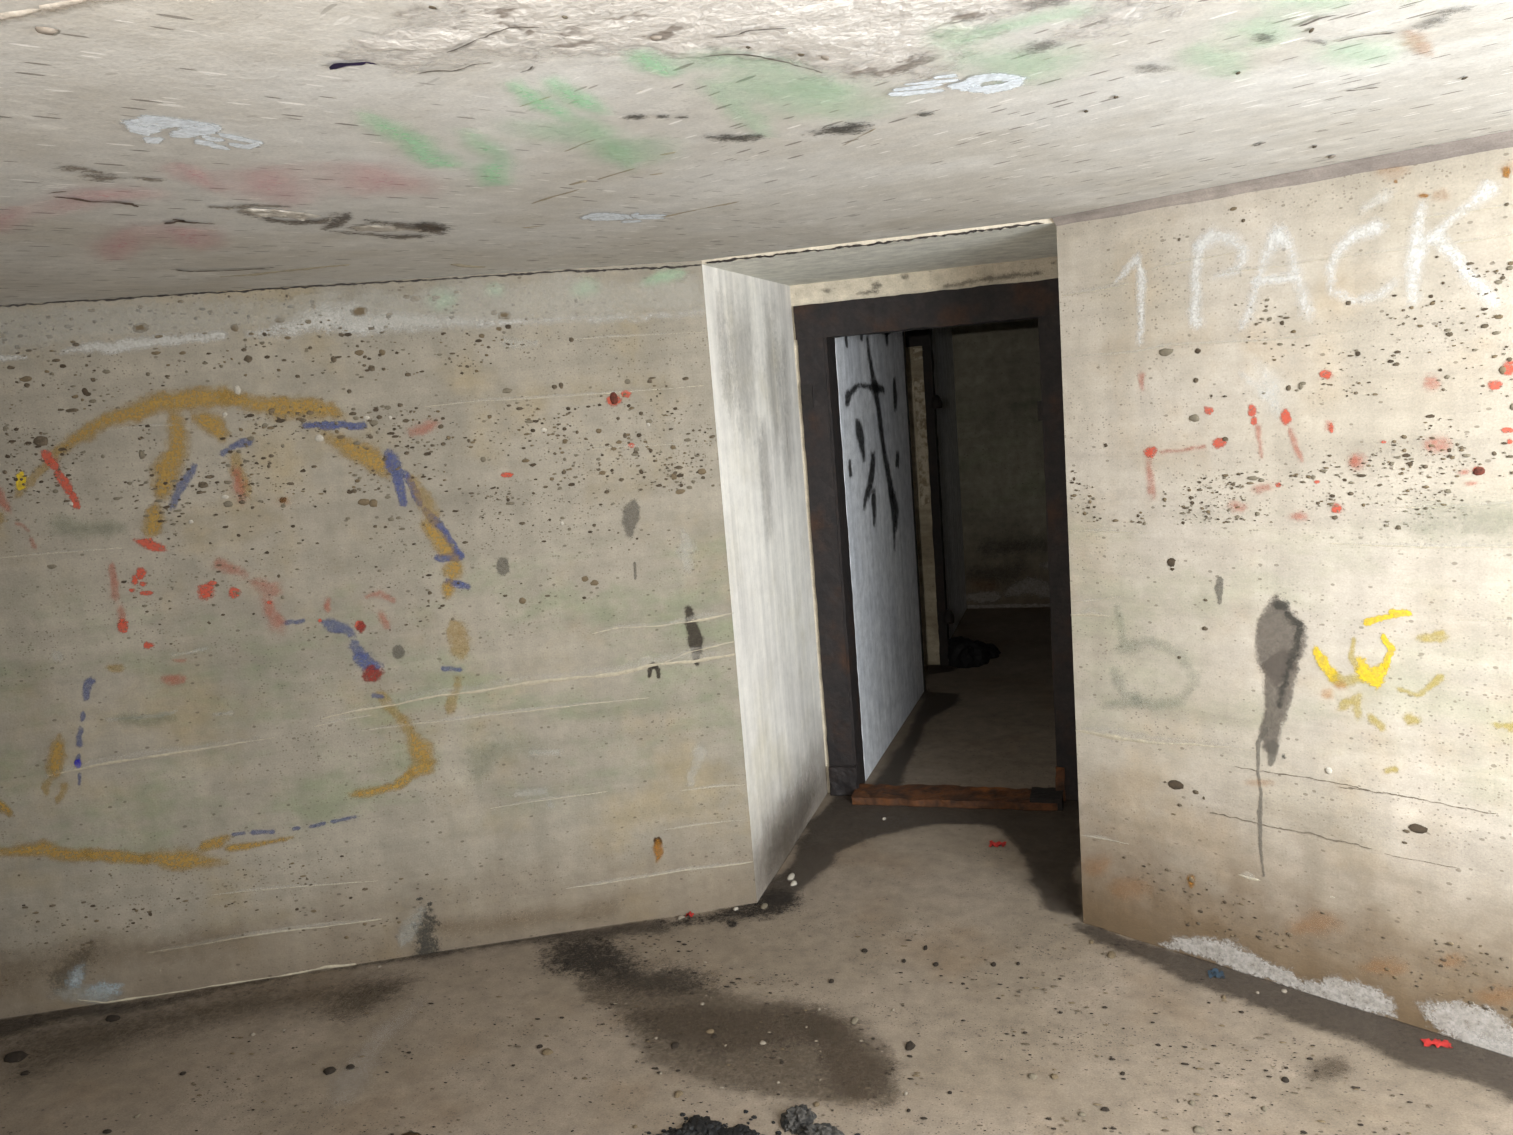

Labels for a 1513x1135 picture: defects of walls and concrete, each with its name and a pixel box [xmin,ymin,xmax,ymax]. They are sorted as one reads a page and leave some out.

spalling [1069,414,1513,530]
damp [876,664,959,786]
damp [1256,596,1306,876]
spalling [1164,780,1205,815]
spalling [1402,823,1428,844]
damp [760,795,1513,1100]
spalling [1135,864,1325,952]
spalling [1320,933,1513,1018]
damp [585,979,892,1099]